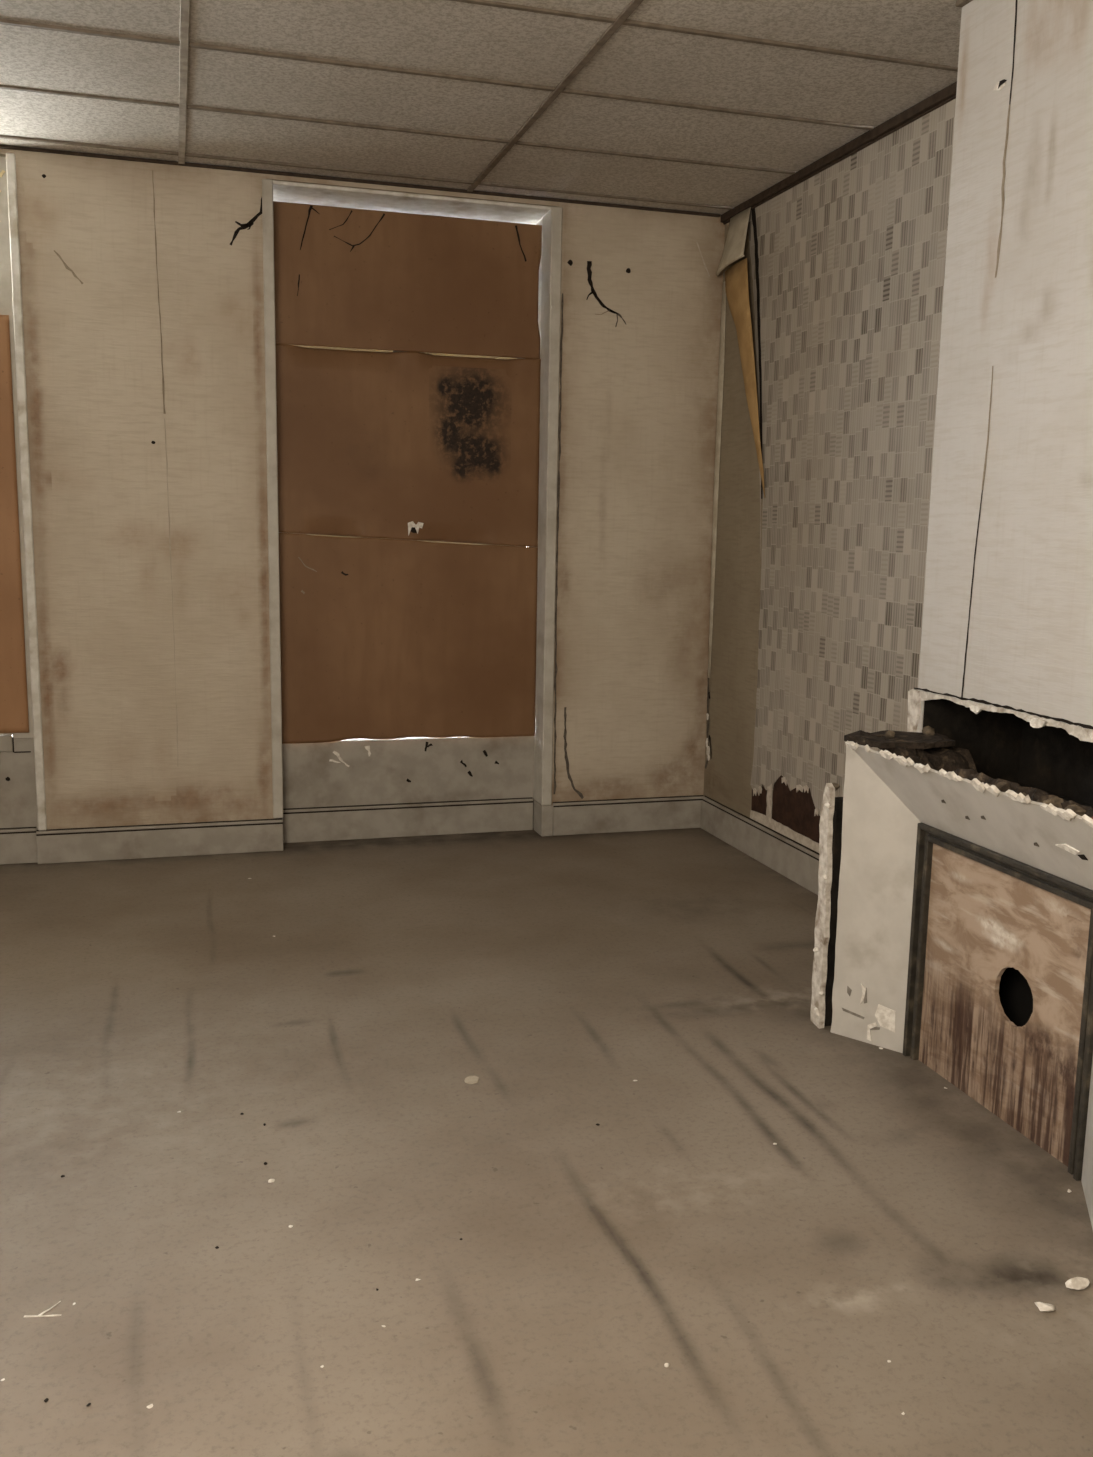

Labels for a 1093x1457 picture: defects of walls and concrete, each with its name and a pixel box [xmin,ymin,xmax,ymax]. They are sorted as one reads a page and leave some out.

crack [230,198,262,246]
crack [297,205,385,296]
leakage [429,366,512,485]
crack [554,261,626,799]
flaking render [907,688,1093,743]
flaking render [845,741,1093,828]
peeling [1034,842,1088,860]
flaking render [782,777,896,1041]